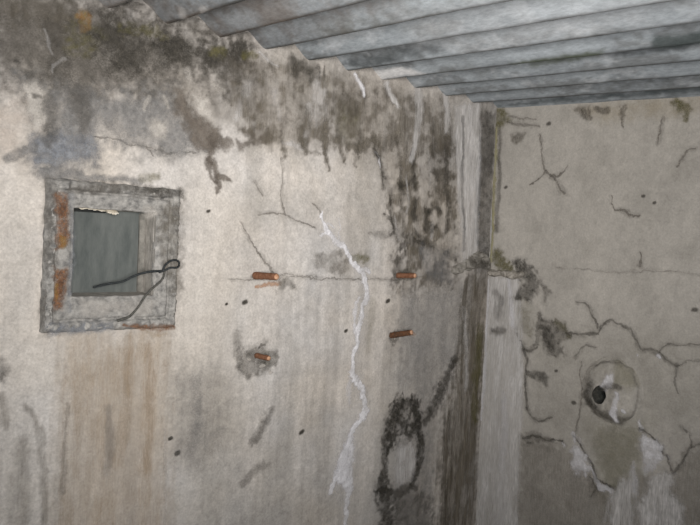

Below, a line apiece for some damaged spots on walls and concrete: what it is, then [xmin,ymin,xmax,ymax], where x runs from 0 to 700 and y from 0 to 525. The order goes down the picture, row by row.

rust [55,195,70,249]
rust [54,269,67,309]
water stain [0,0,547,525]
crack [525,414,608,486]
water stain [571,434,683,525]